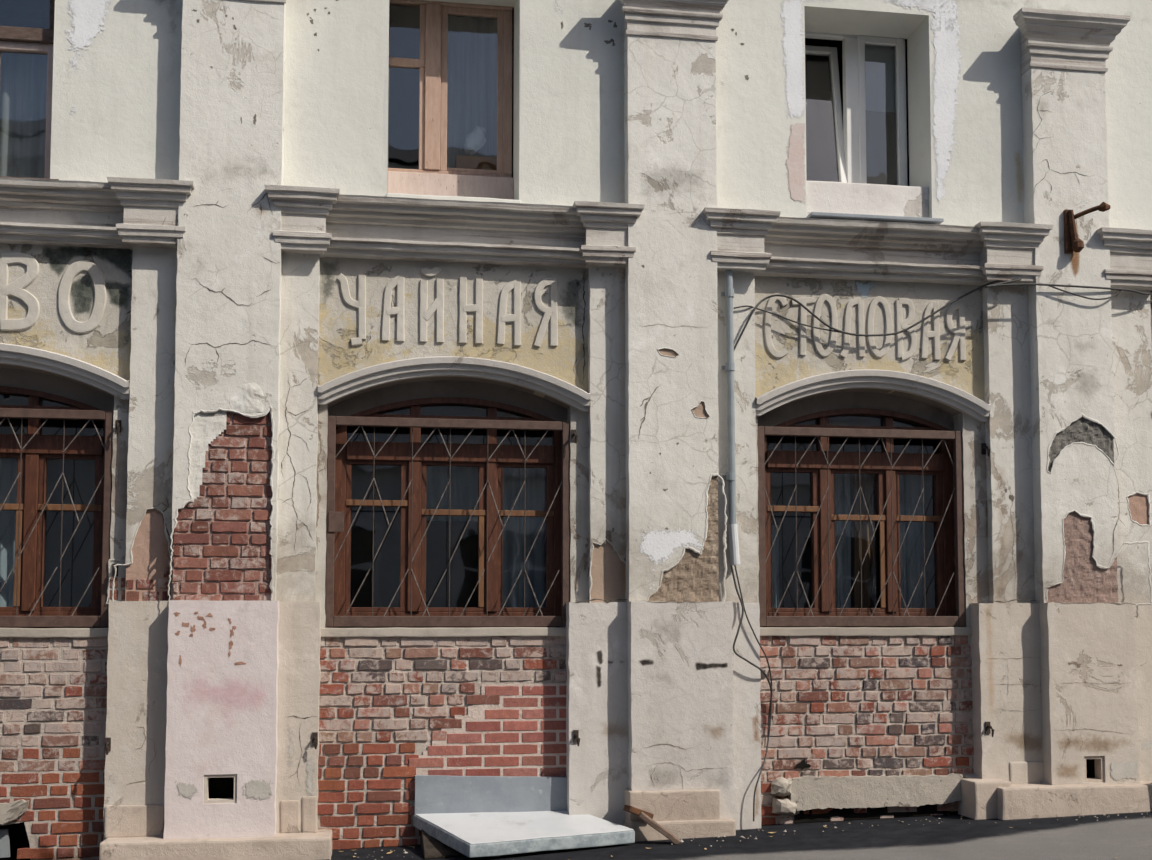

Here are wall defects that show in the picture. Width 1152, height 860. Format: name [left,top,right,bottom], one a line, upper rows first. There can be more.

crack [1032,91,1096,193]
crack [197,181,280,214]
crack [195,278,269,306]
crack [639,387,658,435]
flaking render [1046,413,1119,474]
flaking render [106,405,276,637]
flaking render [574,528,626,603]
flaking render [646,473,728,602]
flaking render [1045,510,1152,606]
flaking render [1126,491,1151,526]
peeling [228,618,247,665]